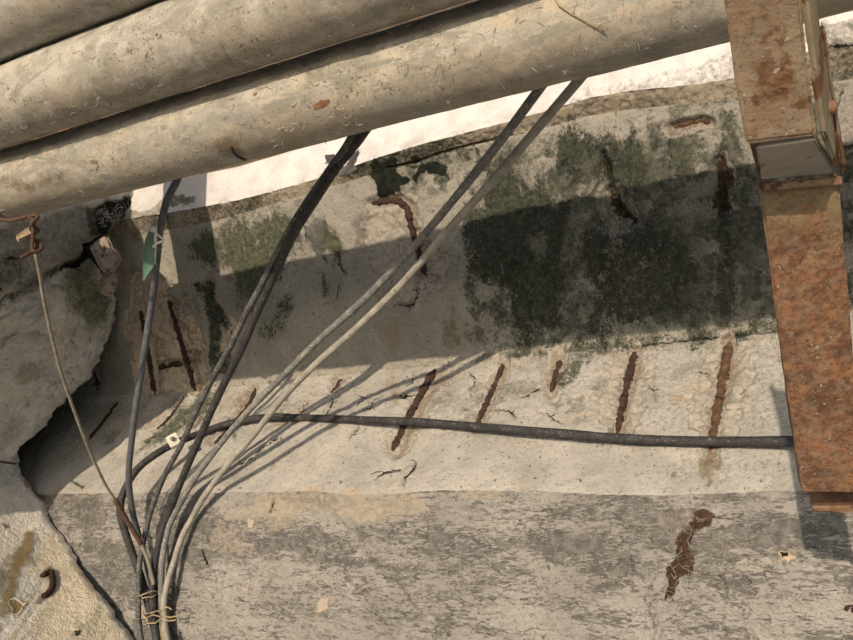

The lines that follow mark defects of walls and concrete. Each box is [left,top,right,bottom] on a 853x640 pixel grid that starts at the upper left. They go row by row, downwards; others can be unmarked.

corrosion [364,191,446,290]
spalling [361,209,454,309]
spalling [120,271,207,396]
corrosion [381,356,452,459]
spalling [585,358,627,432]
corrosion [607,338,648,434]
spalling [626,365,656,432]
spalling [683,346,757,436]
corrosion [698,329,745,436]
crack [370,459,416,483]
corrosion [36,566,56,604]
corrosion [664,509,715,601]